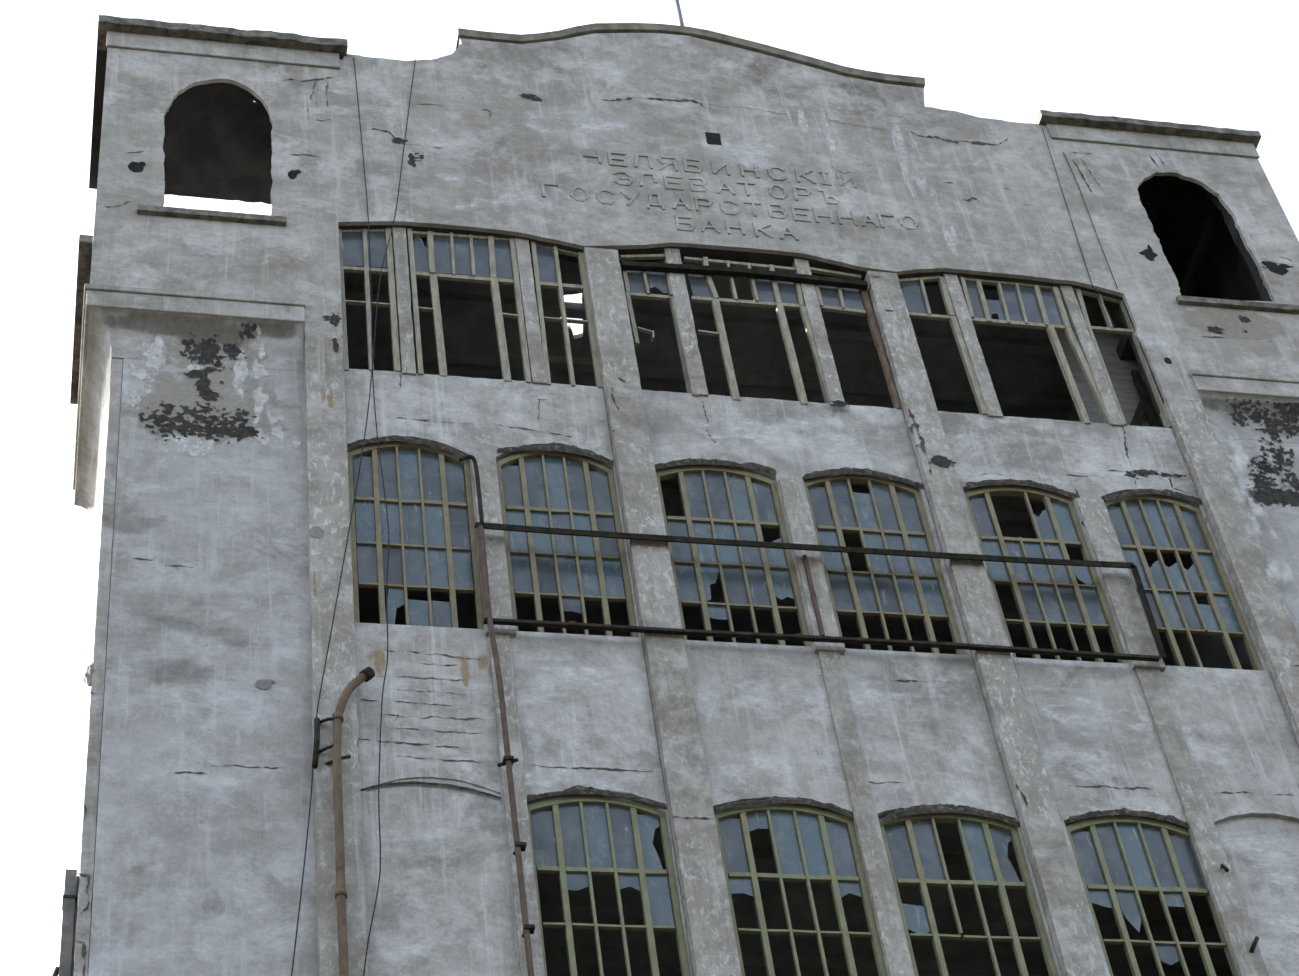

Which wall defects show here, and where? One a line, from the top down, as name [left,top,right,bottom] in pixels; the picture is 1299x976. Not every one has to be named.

flaking render [125,322,294,444]
spalling [1226,398,1299,507]